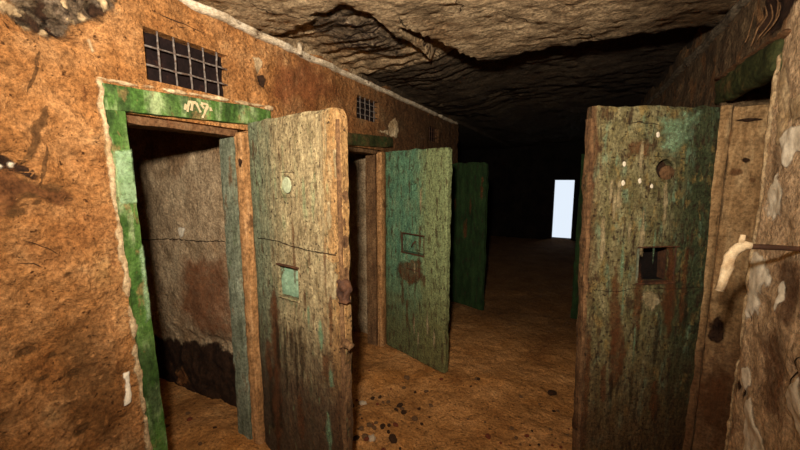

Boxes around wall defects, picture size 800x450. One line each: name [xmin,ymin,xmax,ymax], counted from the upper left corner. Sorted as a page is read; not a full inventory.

crack [141,236,225,244]
flaking render [745,252,785,321]
rust [270,291,281,381]
flaking render [737,366,765,450]
flaking render [785,357,800,436]